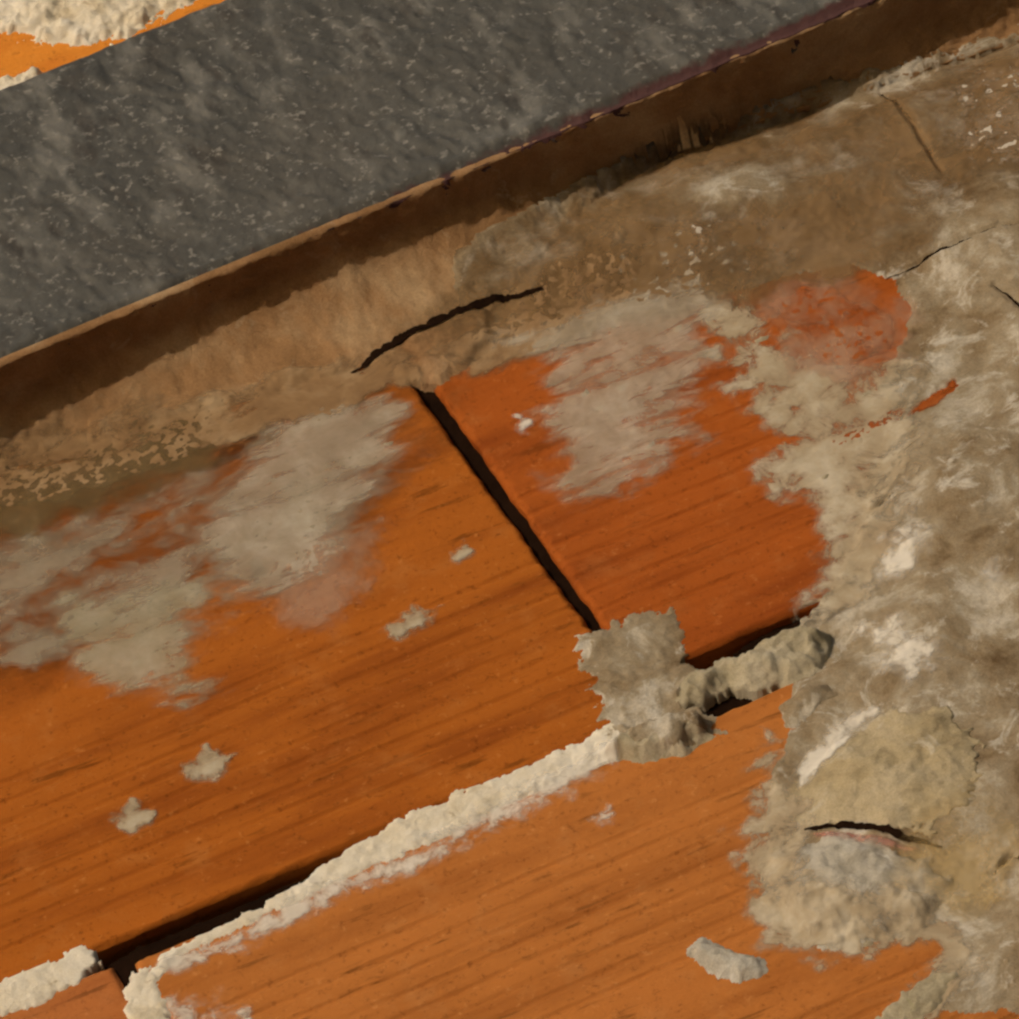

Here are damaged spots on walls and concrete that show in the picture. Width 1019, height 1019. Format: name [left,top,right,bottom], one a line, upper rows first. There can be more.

crack [887,227,995,279]
crack [351,287,543,373]
spalling [768,284,895,366]
crack [993,285,1019,307]
spalling [833,379,956,445]
water stain [0,411,306,672]
efflorescence [158,739,617,970]
crack [804,821,943,851]